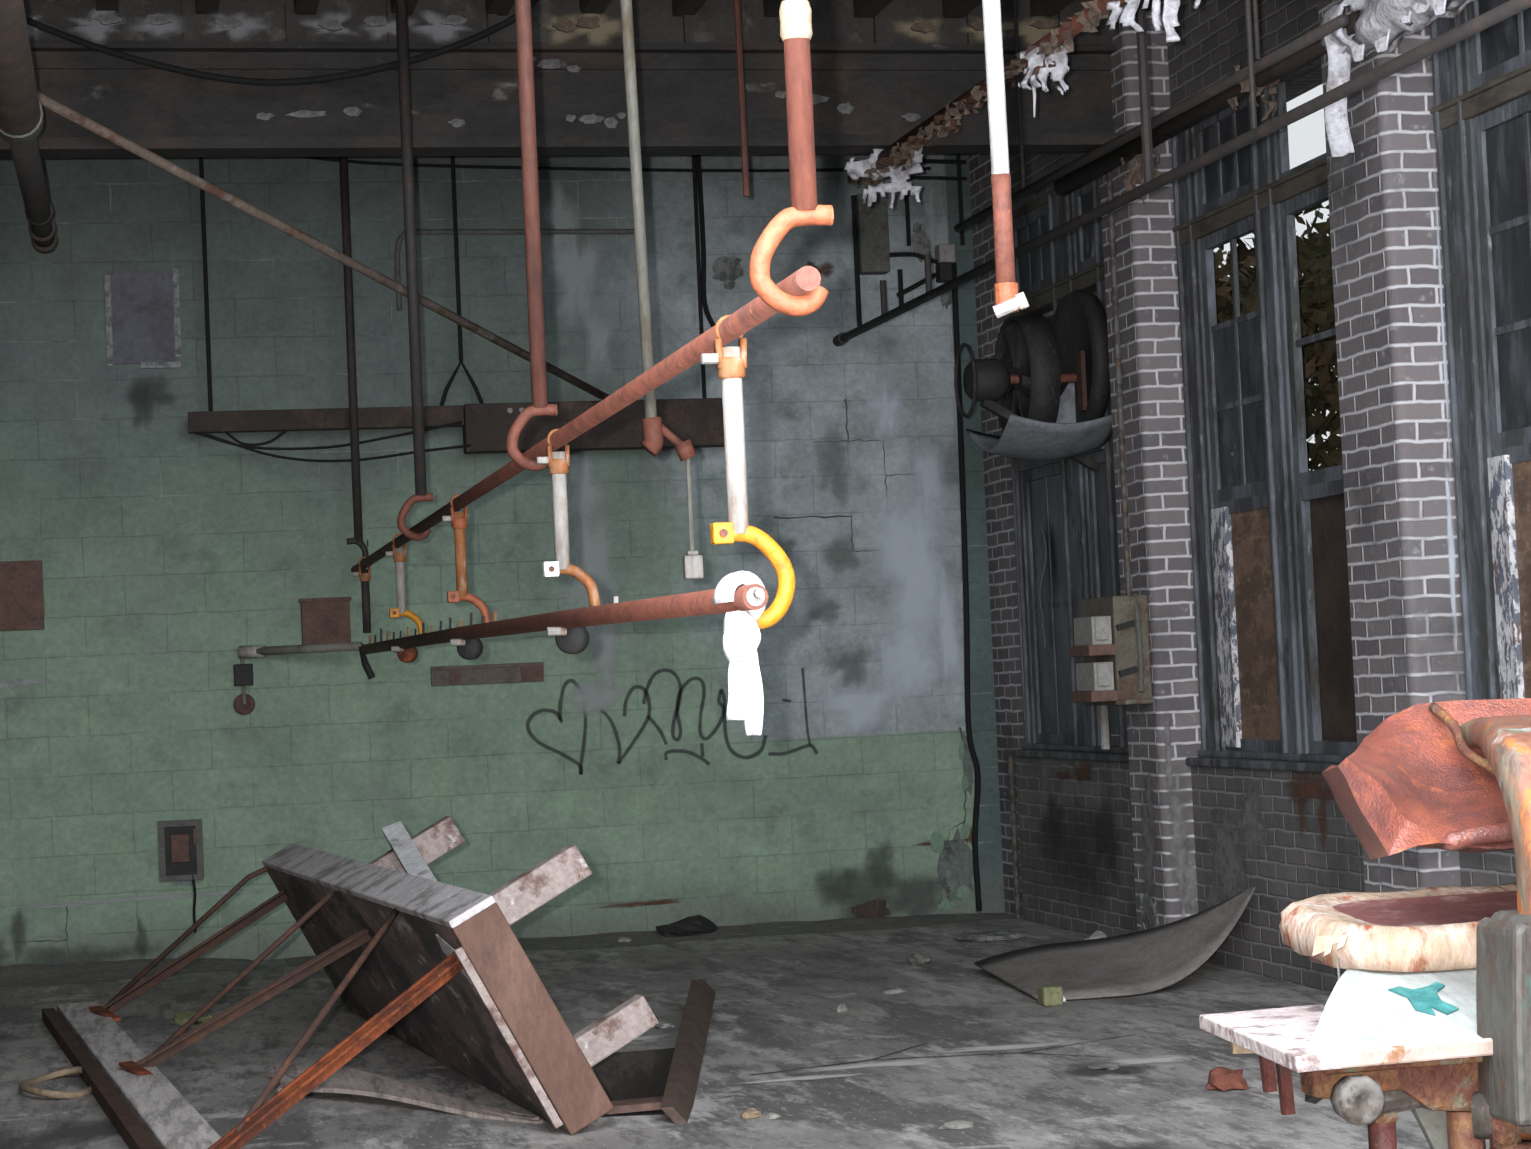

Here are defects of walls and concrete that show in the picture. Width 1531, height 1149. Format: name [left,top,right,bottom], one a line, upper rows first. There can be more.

peeling [930,824,974,910]